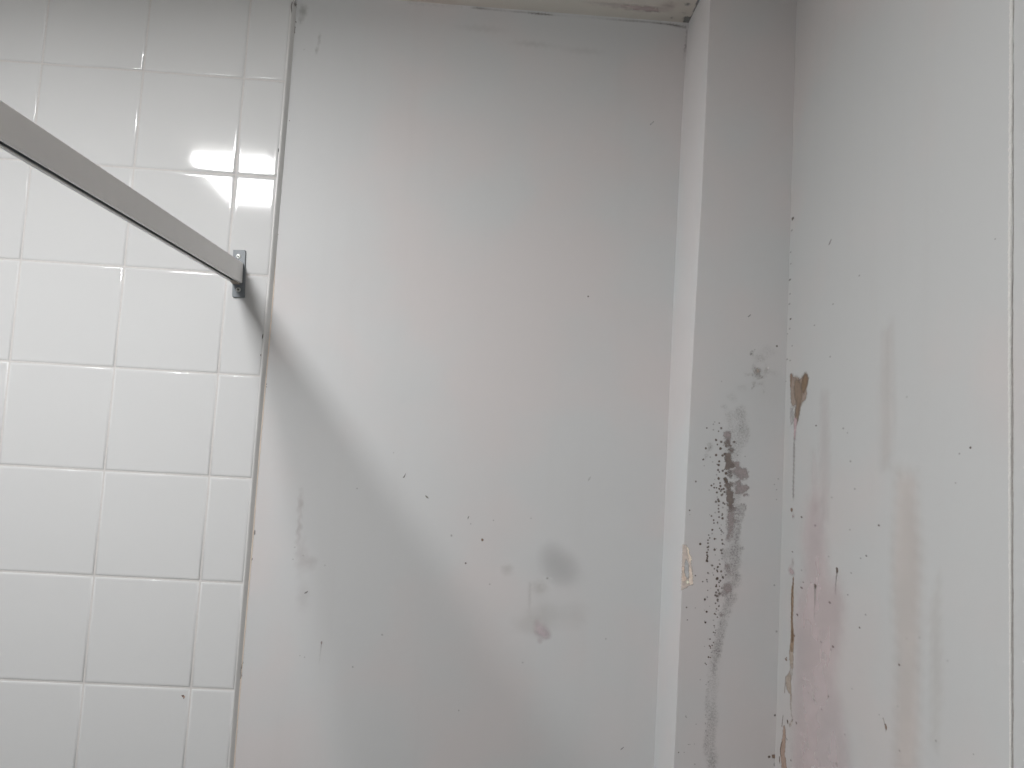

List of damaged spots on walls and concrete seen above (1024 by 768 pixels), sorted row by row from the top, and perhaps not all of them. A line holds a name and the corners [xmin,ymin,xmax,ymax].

peeling [681,545,693,590]
leakage [695,423,749,665]